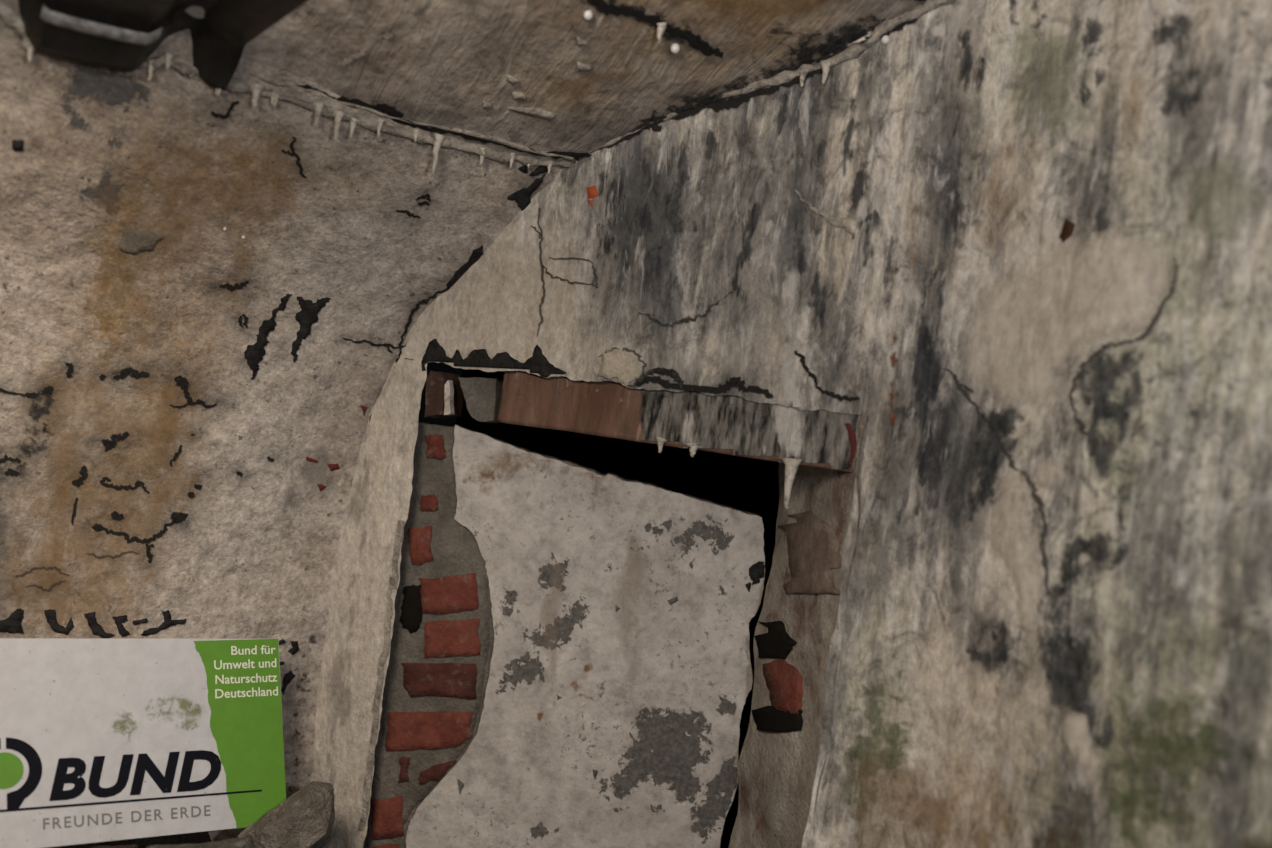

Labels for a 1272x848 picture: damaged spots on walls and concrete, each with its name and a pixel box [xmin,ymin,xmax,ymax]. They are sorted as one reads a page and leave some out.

crack [296,0,926,161]
damp [842,99,879,269]
crack [0,363,217,591]
crack [343,262,473,368]
flaking render [425,434,446,459]
crack [598,348,774,399]
flaking render [644,512,735,569]
damp [712,240,826,456]
damp [912,293,939,484]
damp [1078,351,1143,477]
flaking render [357,520,590,848]
flaking render [593,695,738,844]